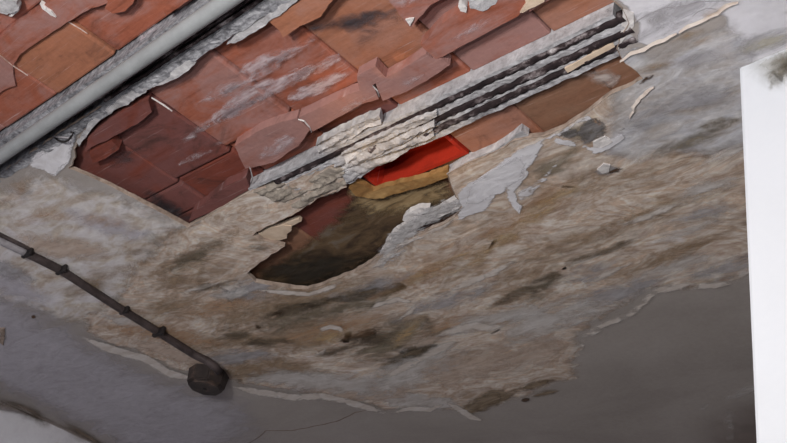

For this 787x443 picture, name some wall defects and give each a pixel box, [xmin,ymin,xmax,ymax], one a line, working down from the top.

spalling [42,0,264,145]
water stain [763,54,787,74]
flaking render [247,0,751,290]
water stain [467,157,525,204]
water stain [518,153,571,200]
flaking render [0,127,749,443]
water stain [0,401,35,416]
water stain [464,380,557,413]